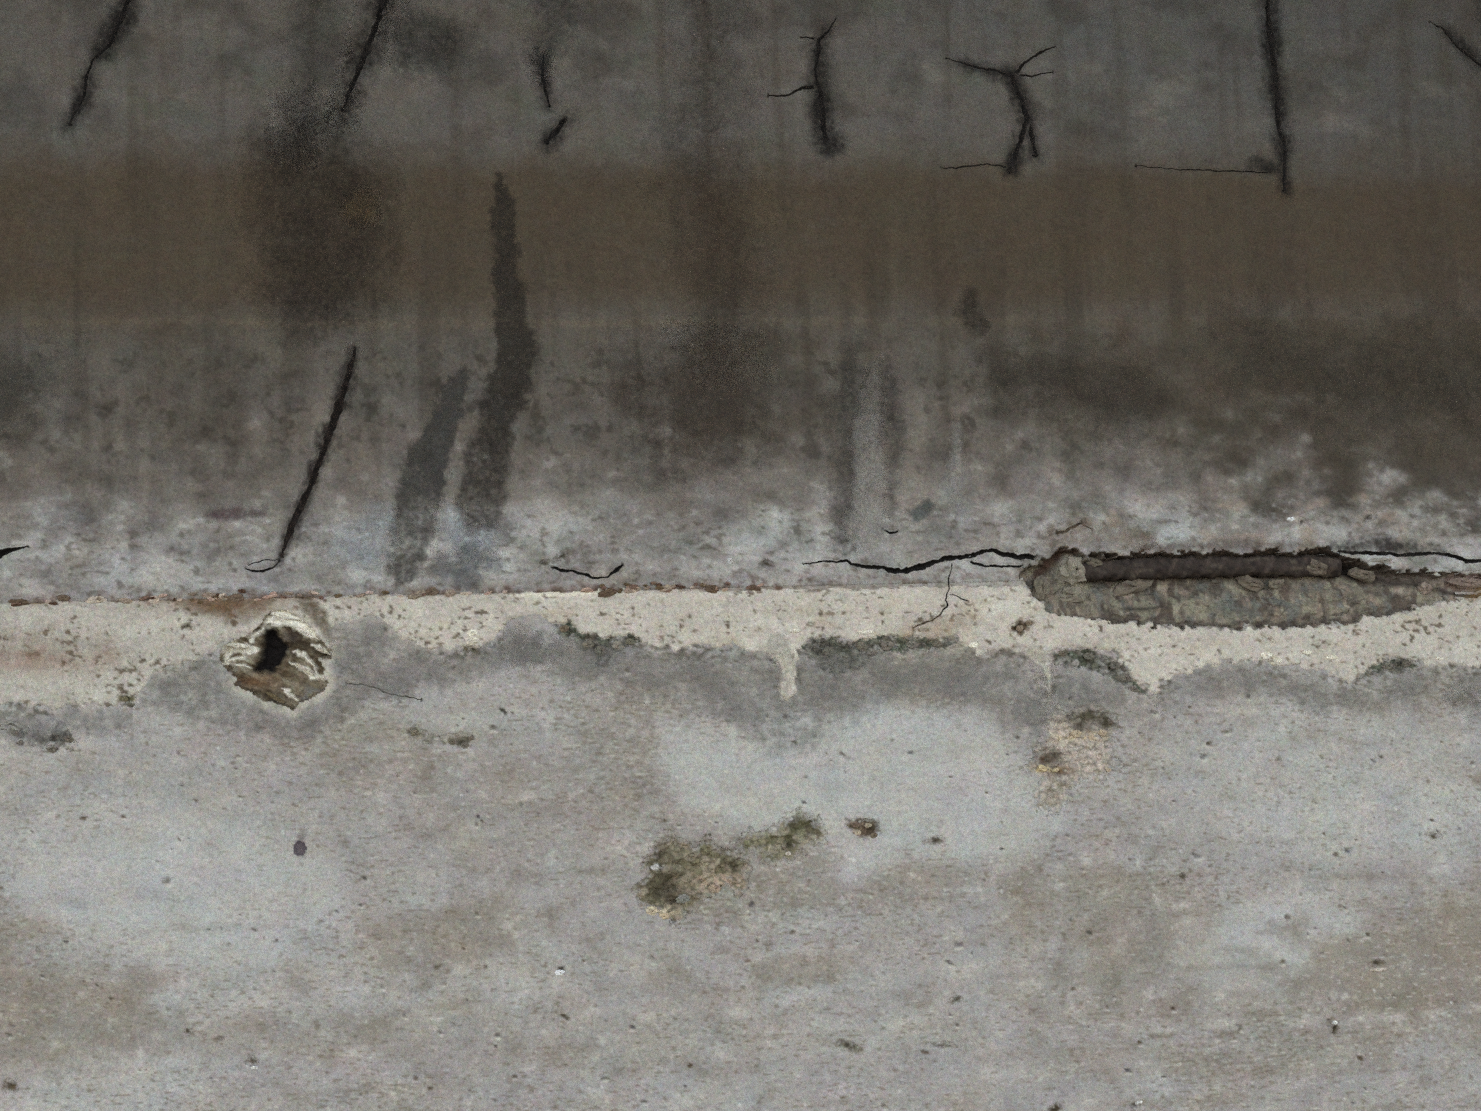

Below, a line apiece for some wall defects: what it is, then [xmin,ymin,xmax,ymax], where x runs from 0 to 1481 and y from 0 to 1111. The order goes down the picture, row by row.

crack [769,17,844,155]
crack [941,45,1056,174]
crack [1136,0,1291,193]
leakage [334,173,535,587]
crack [245,349,358,575]
crack [0,545,28,561]
crack [803,521,1093,630]
crack [1331,538,1481,600]
flaking render [0,546,1481,753]
spalling [1020,696,1124,817]
spalling [631,807,828,929]
spalling [844,817,882,840]